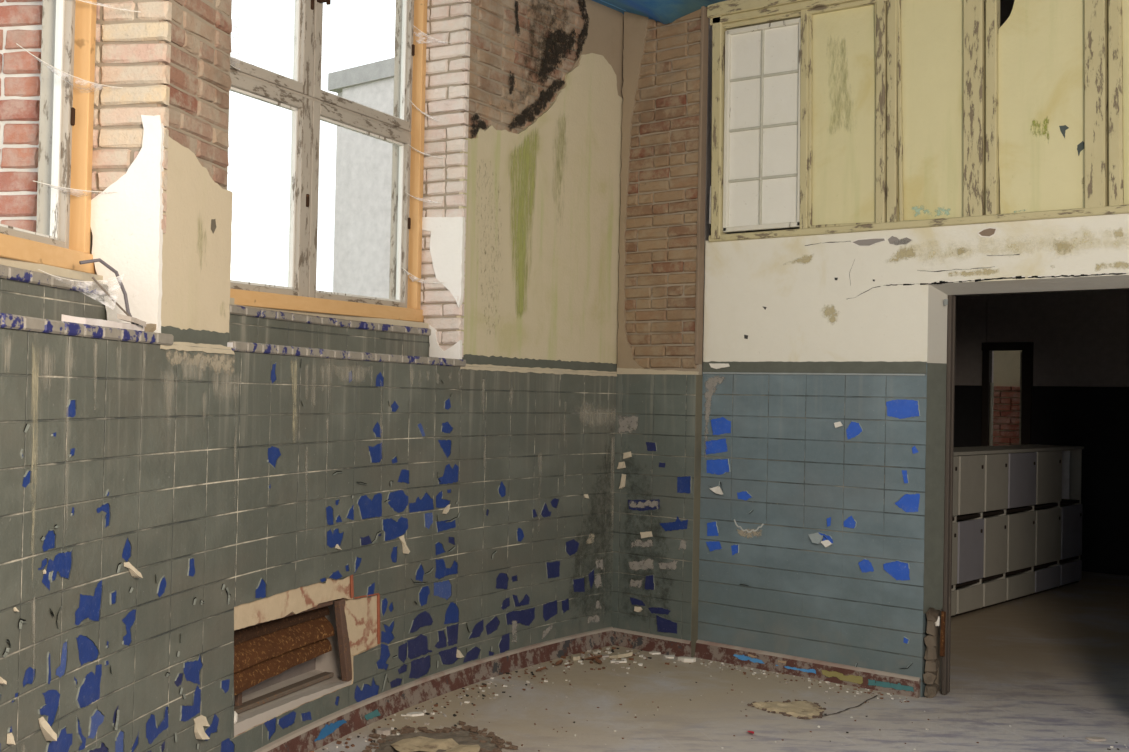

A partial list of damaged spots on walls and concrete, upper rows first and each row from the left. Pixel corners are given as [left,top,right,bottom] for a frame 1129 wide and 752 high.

damp [509,0,589,131]
spalling [91,0,232,233]
damp [471,113,489,138]
spalling [420,0,588,357]
peeling [886,399,920,420]
peeling [894,470,920,512]
peeling [38,524,73,590]
peeling [122,538,143,578]
peeling [234,394,595,702]
peeling [858,558,910,581]
peeling [0,580,235,752]
peeling [264,711,312,741]